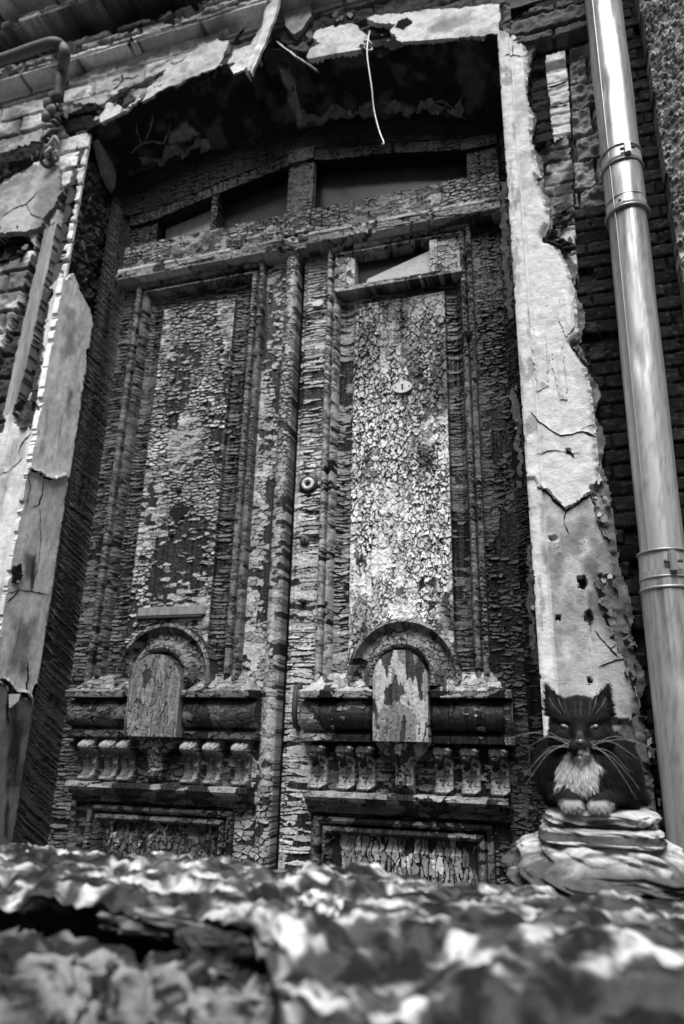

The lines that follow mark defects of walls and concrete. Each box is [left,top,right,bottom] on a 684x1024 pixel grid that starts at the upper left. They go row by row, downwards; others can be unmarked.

spalling [304,10,412,65]
spalling [61,104,99,137]
spalling [530,52,553,176]
spalling [0,141,45,184]
spalling [0,226,35,264]
spalling [61,193,105,305]
flaking render [499,180,515,321]
spalling [542,229,572,248]
spalling [12,396,40,429]
crack [531,411,597,458]
crack [1,430,67,603]
crack [537,483,603,533]